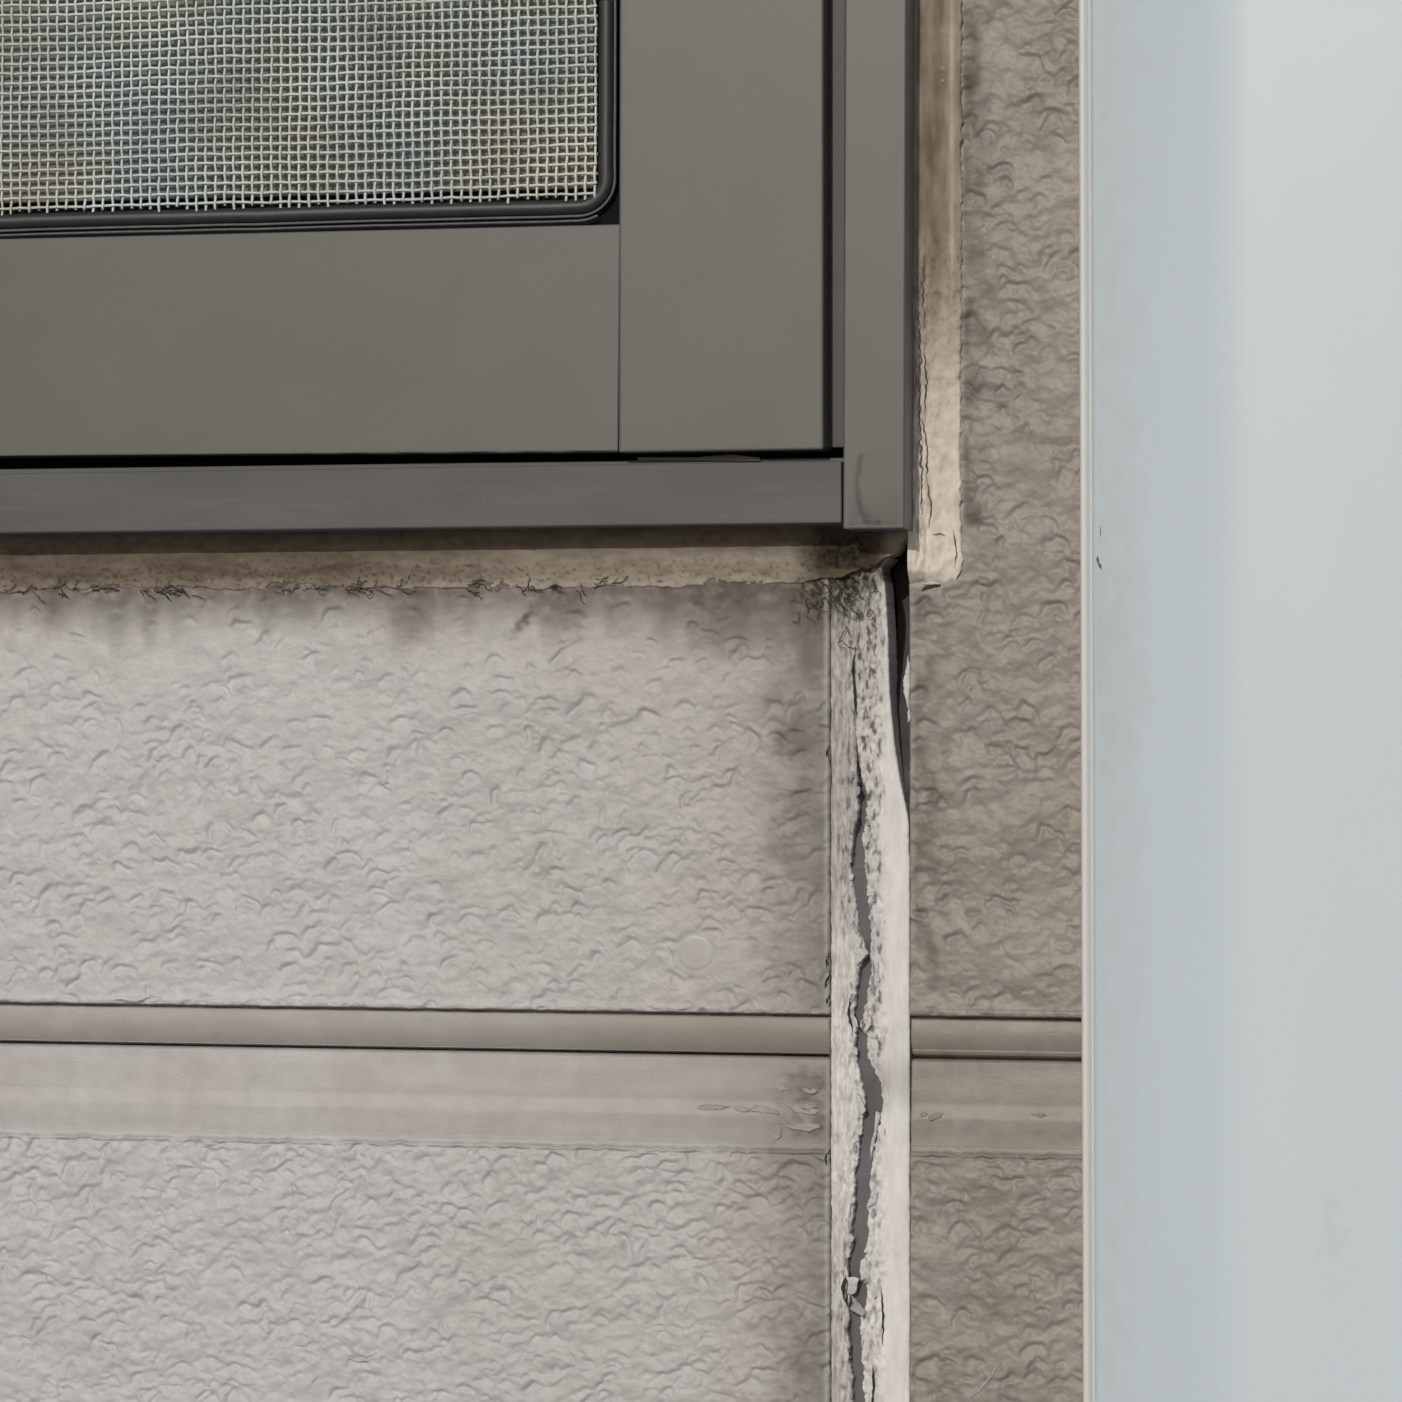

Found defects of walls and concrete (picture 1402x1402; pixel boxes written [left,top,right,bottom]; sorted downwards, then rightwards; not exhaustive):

crack [893,255,957,816]
leakage [266,579,432,599]
leakage [661,536,874,603]
crack [824,578,914,1402]
peeling [696,1085,825,1143]